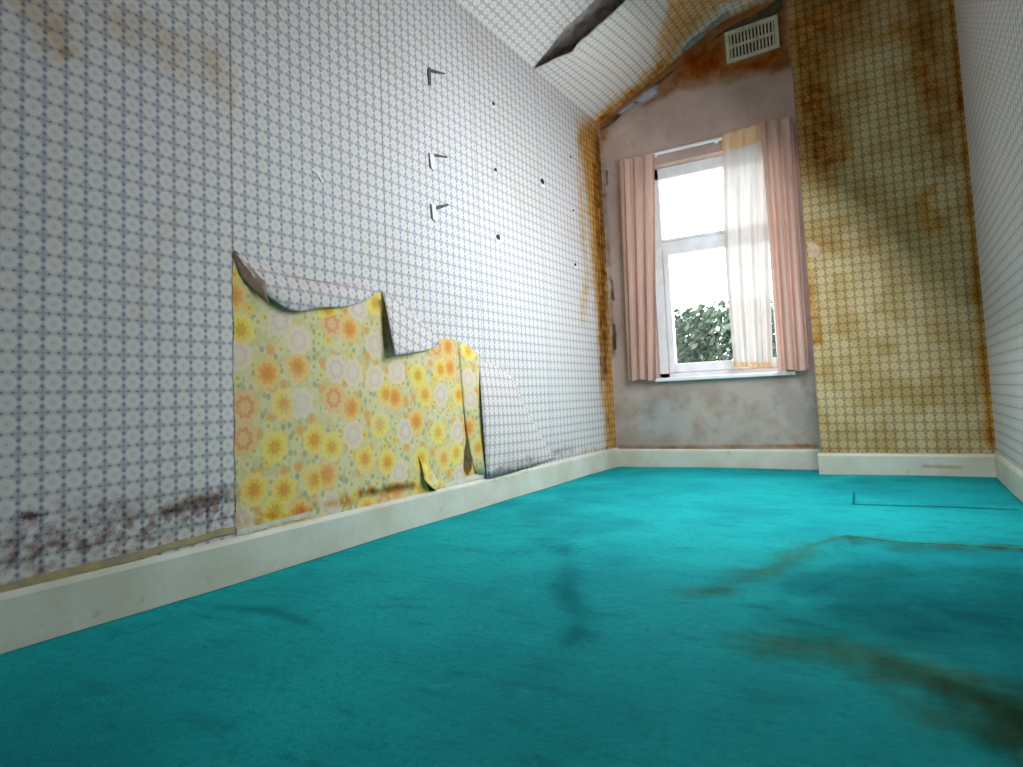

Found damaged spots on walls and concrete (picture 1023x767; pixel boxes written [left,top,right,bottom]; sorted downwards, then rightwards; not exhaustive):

crack [537,0,625,66]